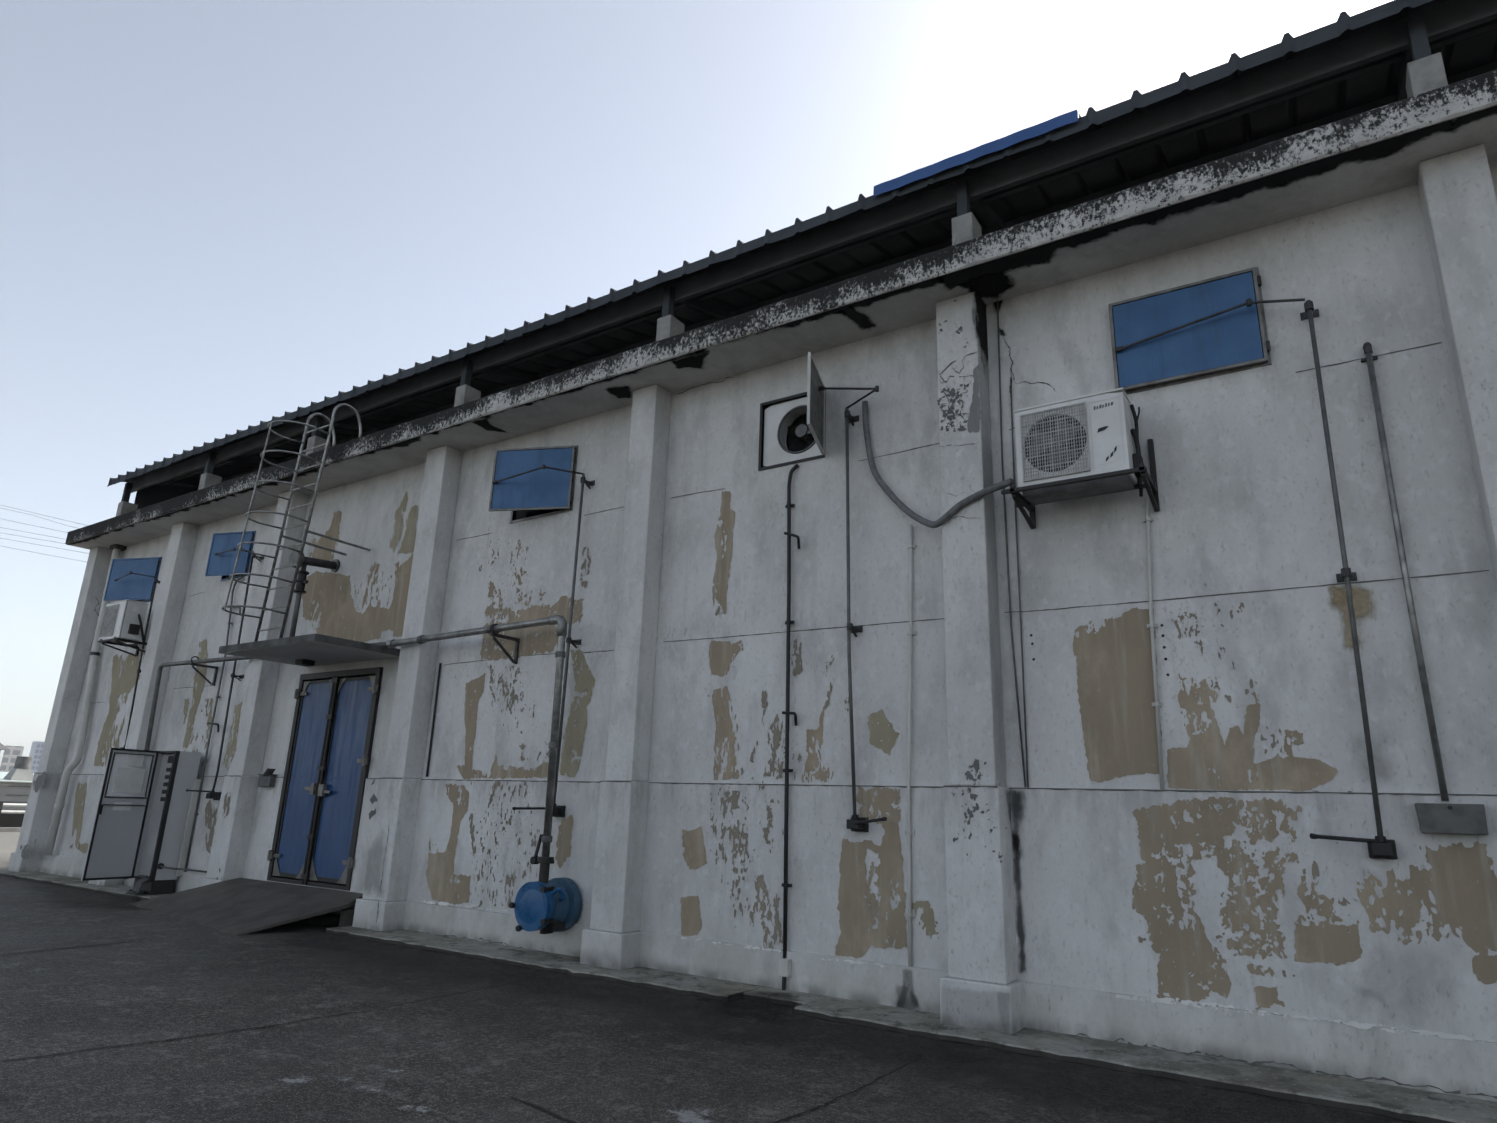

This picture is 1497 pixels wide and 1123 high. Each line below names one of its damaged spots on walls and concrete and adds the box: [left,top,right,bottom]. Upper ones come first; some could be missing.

mould [67,106,1497,545]
spalling [967,364,981,433]
peeling [302,491,418,642]
peeling [712,491,735,616]
peeling [70,782,89,853]
peeling [94,653,140,767]
peeling [424,540,595,912]
peeling [680,639,849,953]
peeling [821,786,939,968]
water stain [952,759,1025,972]
peeling [1073,602,1497,1043]